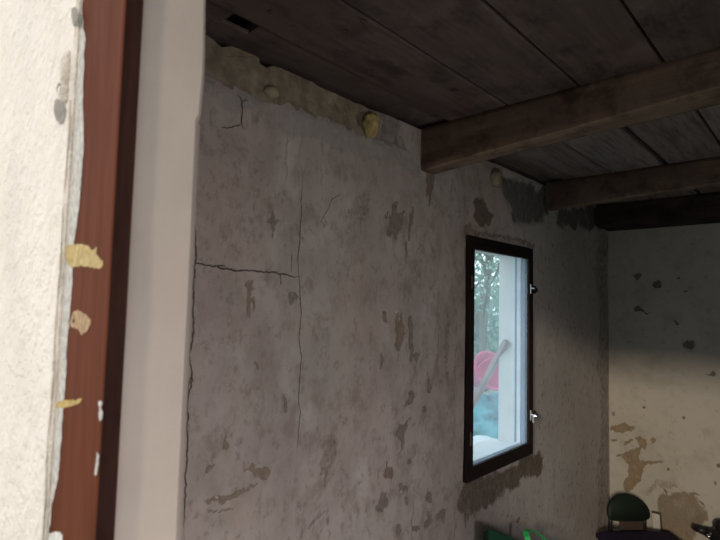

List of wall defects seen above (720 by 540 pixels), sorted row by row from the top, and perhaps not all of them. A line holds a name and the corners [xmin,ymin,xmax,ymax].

crack [222,95,247,129]
flaking render [204,34,406,150]
peeling [69,310,92,335]
crack [184,186,303,519]
flaking render [610,422,670,492]